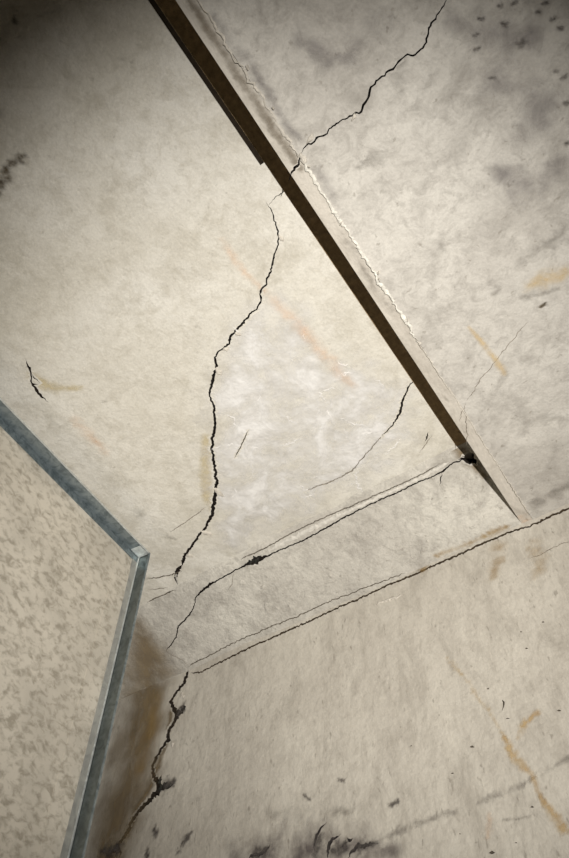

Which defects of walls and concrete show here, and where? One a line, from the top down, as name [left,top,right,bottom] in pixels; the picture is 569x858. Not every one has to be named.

water stain [97,623,167,858]
crack [119,1,569,853]